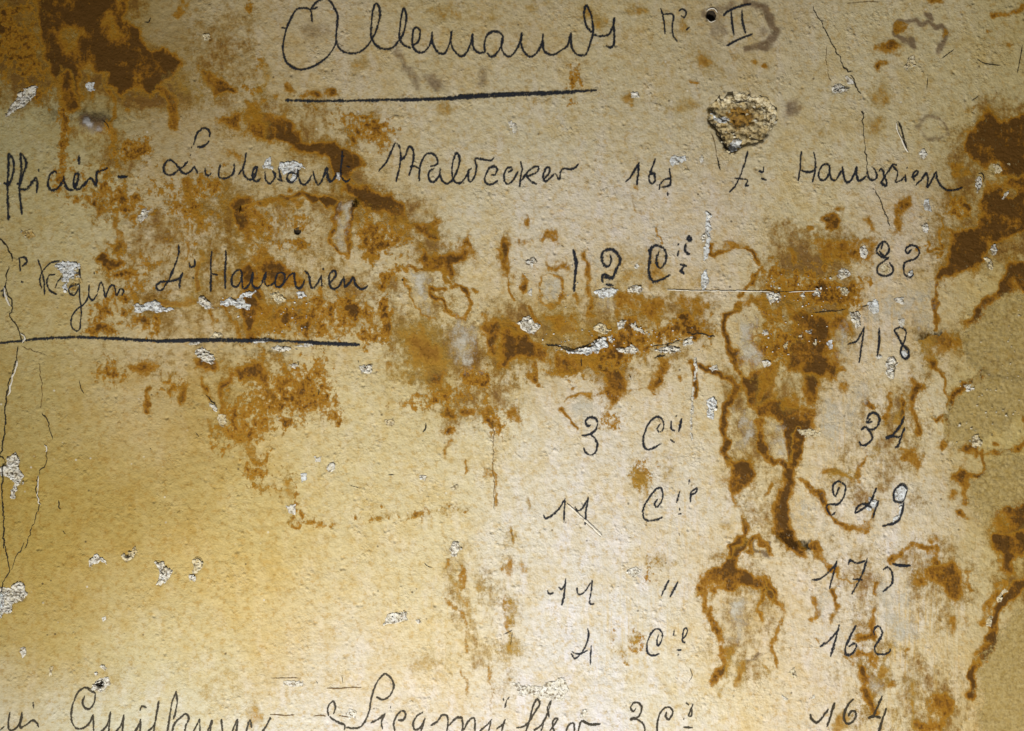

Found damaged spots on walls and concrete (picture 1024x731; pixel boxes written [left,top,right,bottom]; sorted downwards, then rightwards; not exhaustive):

flaking render [5,86,38,117]
flaking render [707,92,777,156]
damp [202,173,365,261]
damp [402,264,479,365]
damp [708,241,772,376]
crack [0,239,53,592]
peeling [517,316,718,441]
peeling [0,453,24,499]
damp [949,440,1024,520]
peeling [0,582,28,618]
damp [696,538,786,697]
damp [964,578,1024,701]